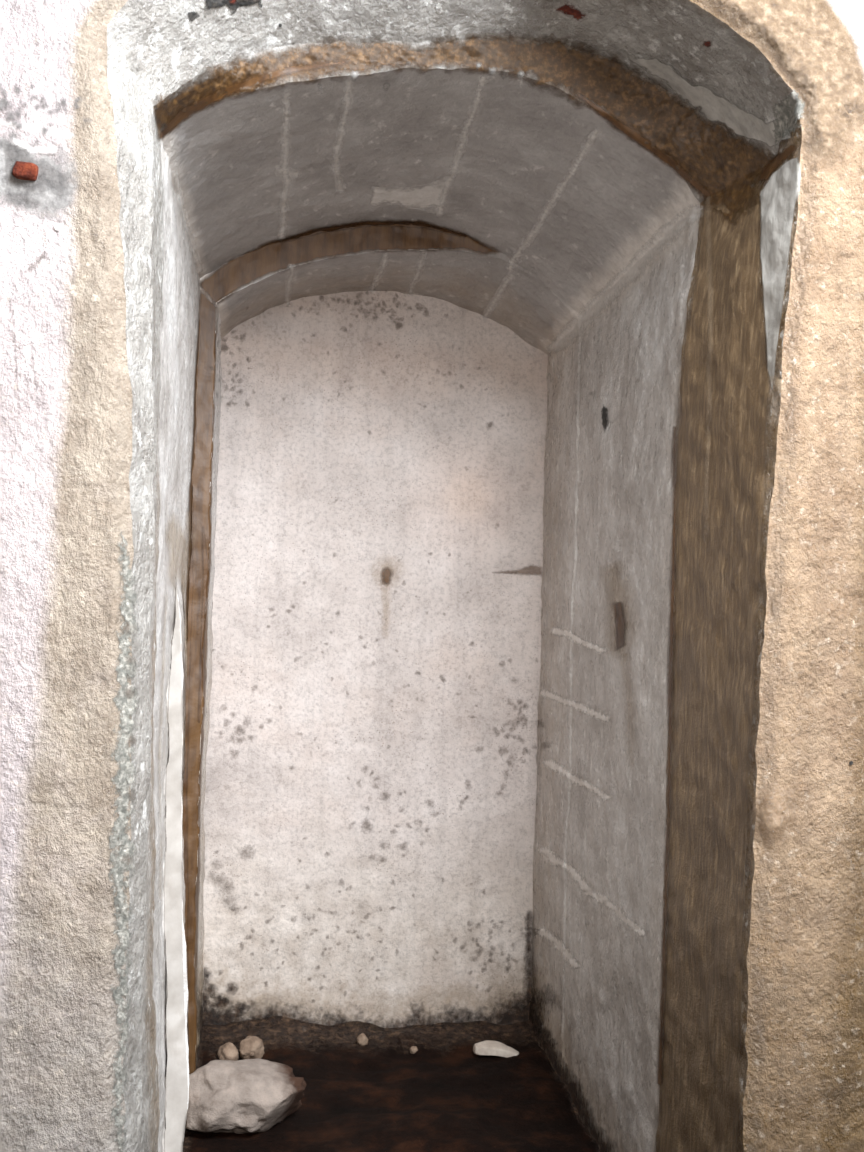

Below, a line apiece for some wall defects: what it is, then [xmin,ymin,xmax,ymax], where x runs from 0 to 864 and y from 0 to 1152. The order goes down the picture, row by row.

spalling [188,0,262,21]
corrosion [382,568,391,584]
water stain [155,33,773,1152]